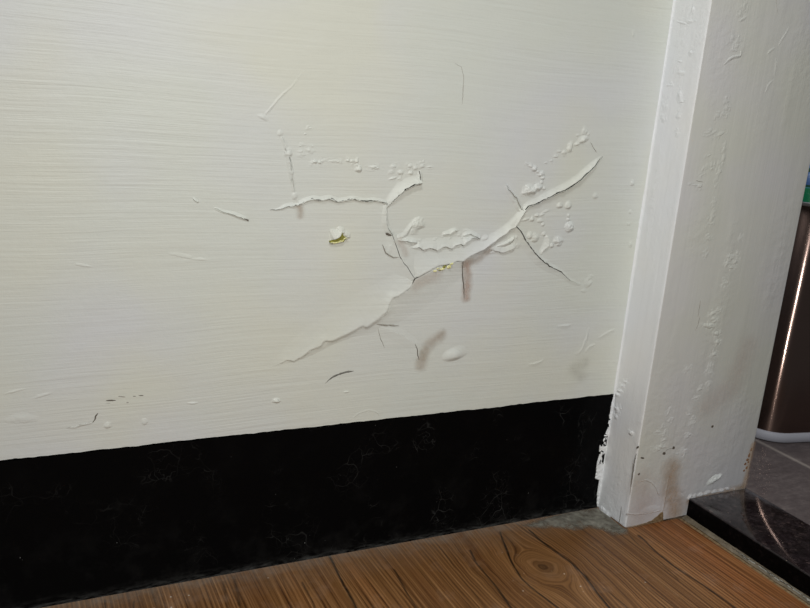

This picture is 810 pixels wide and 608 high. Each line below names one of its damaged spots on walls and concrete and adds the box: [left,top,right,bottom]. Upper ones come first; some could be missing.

crack [257,69,601,368]
peeling [595,398,614,504]